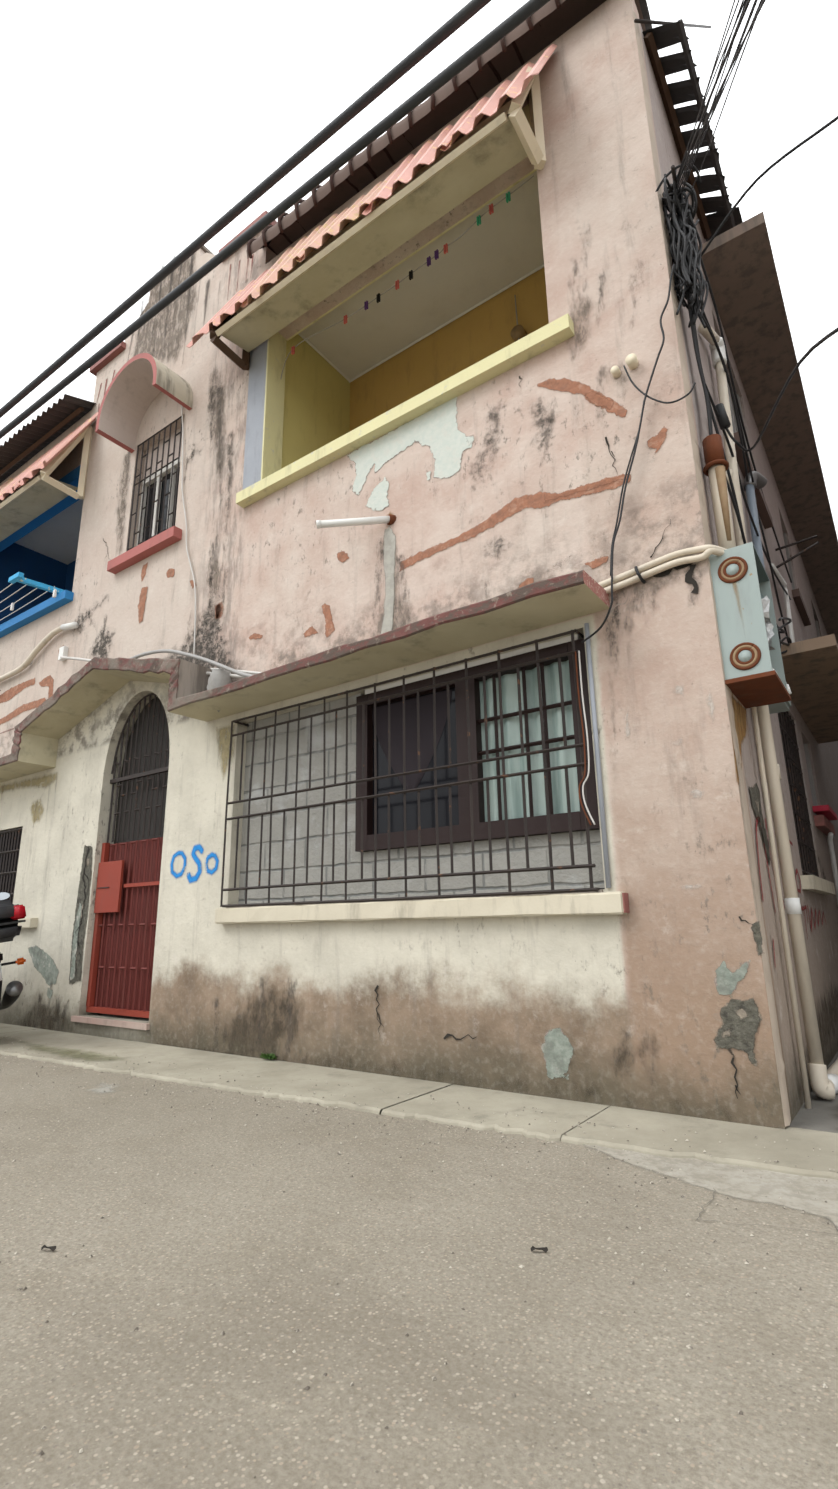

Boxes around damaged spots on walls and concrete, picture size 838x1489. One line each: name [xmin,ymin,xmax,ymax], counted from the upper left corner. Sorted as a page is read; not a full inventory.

water stain [209,372,233,507]
peeling [348,397,474,511]
water stain [170,538,232,674]
water stain [213,983,298,1051]
peeling [541,1028,573,1080]
spalling [714,922,764,1066]